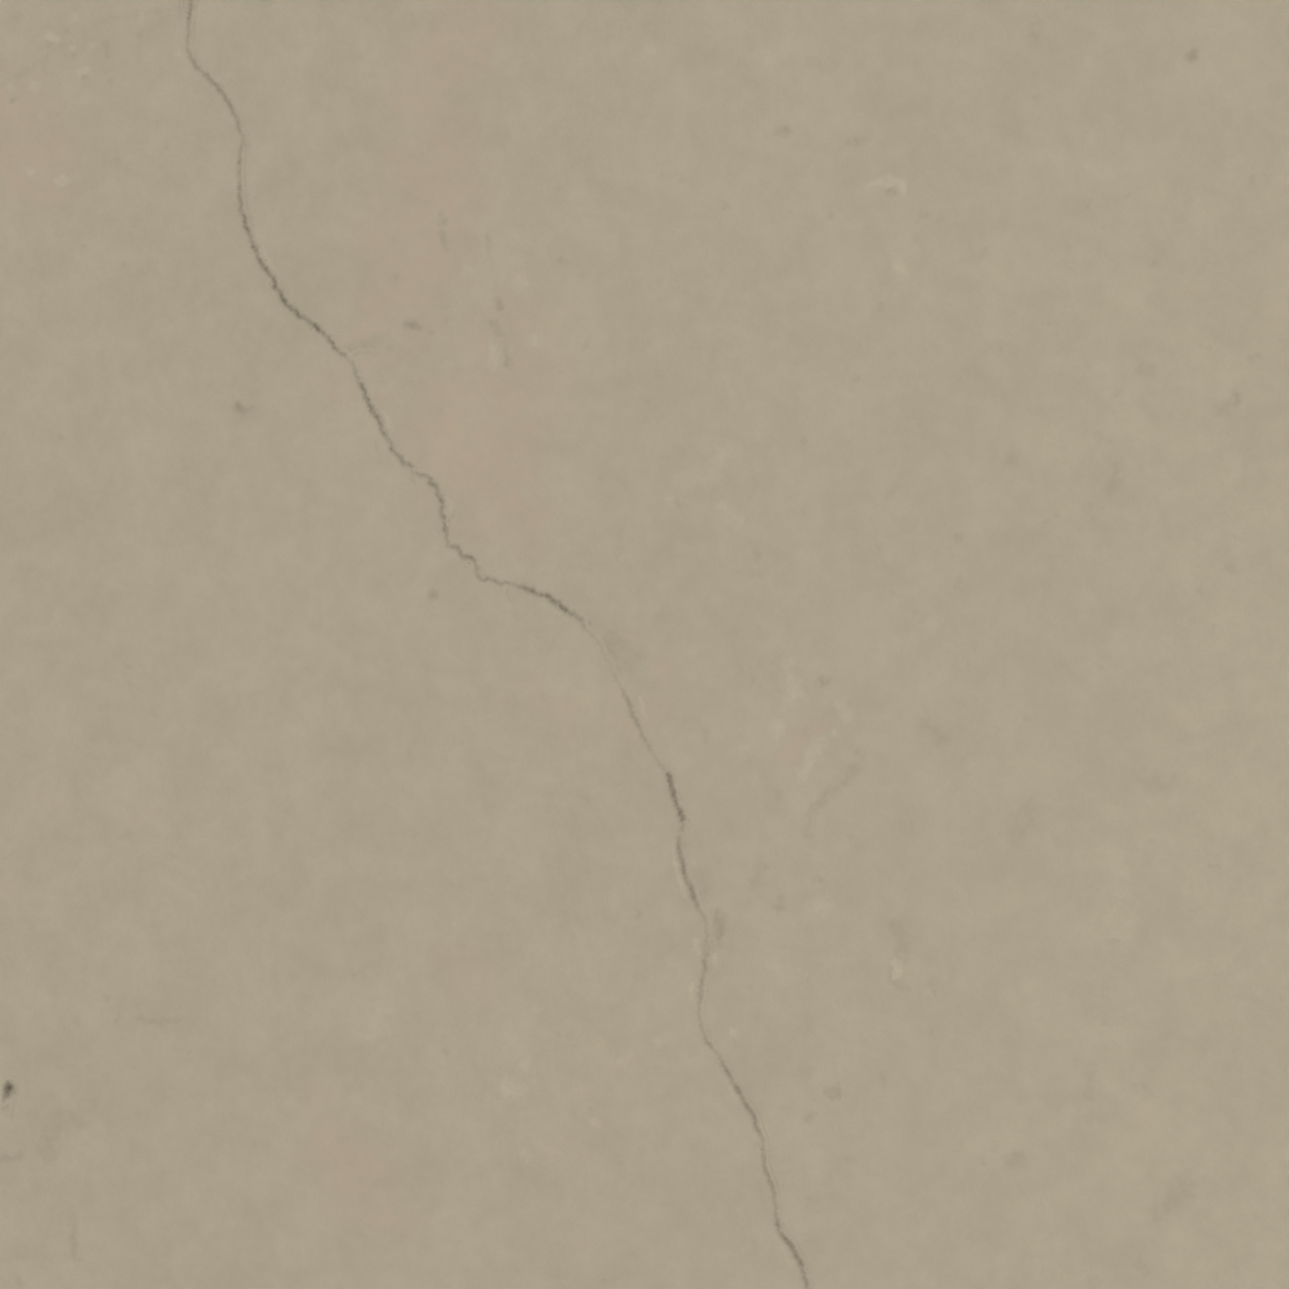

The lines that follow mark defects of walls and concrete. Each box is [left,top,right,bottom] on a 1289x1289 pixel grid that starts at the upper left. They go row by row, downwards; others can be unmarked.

crack [171,0,814,1289]